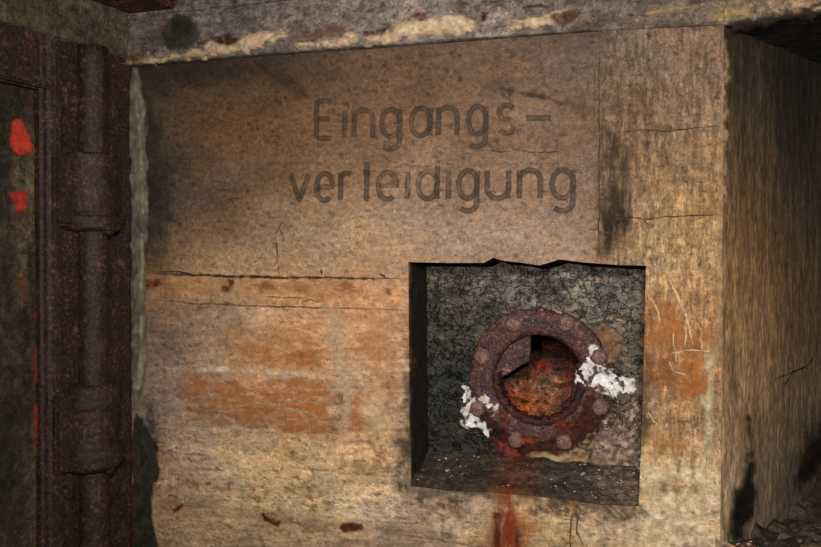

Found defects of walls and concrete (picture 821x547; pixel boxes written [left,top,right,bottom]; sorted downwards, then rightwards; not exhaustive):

leakage [163,15,198,49]
spalling [130,27,289,63]
spalling [295,12,485,47]
spalling [508,4,575,29]
leakage [602,184,627,248]
rust [650,303,708,396]
rust [484,395,606,462]
rust [491,508,527,547]